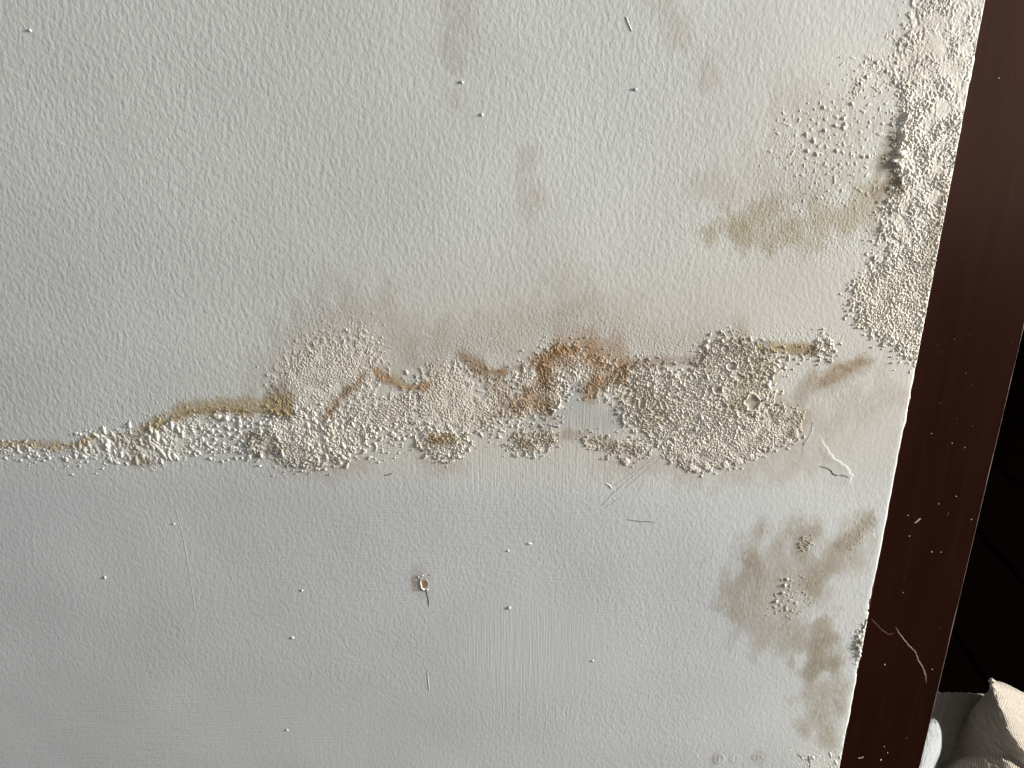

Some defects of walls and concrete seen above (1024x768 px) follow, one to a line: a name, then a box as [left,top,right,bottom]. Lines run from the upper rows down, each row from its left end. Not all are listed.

water stain [758,343,816,354]
water stain [134,395,291,440]